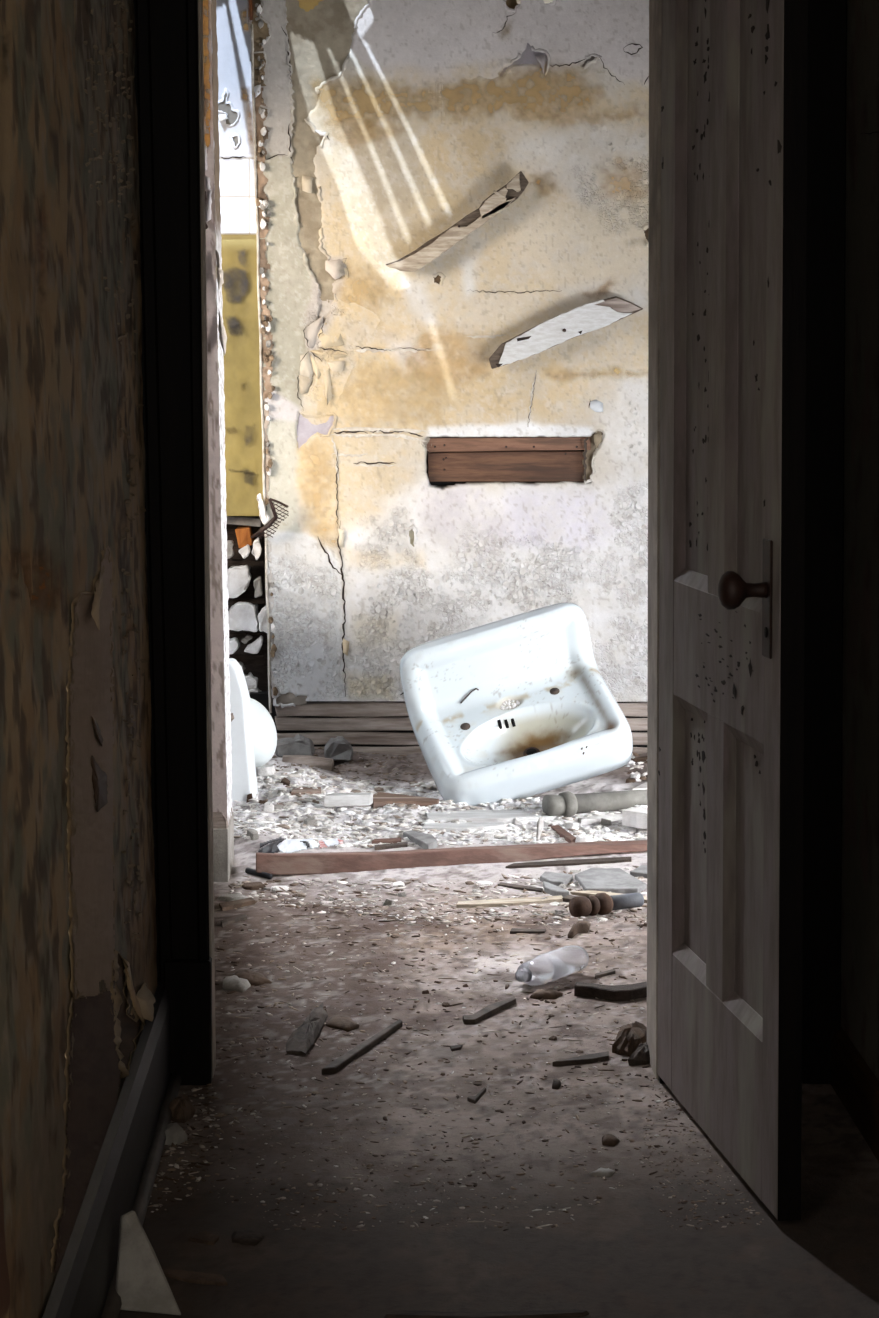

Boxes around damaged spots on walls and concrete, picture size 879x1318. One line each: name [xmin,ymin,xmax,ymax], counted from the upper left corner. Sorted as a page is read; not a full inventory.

flaking render [502,0,521,12]
peeling [500,43,551,77]
damp [319,67,590,123]
peeling [215,250,224,289]
flaking render [432,272,446,286]
peeling [218,0,373,708]
peeling [369,515,418,559]
crack [318,427,428,697]